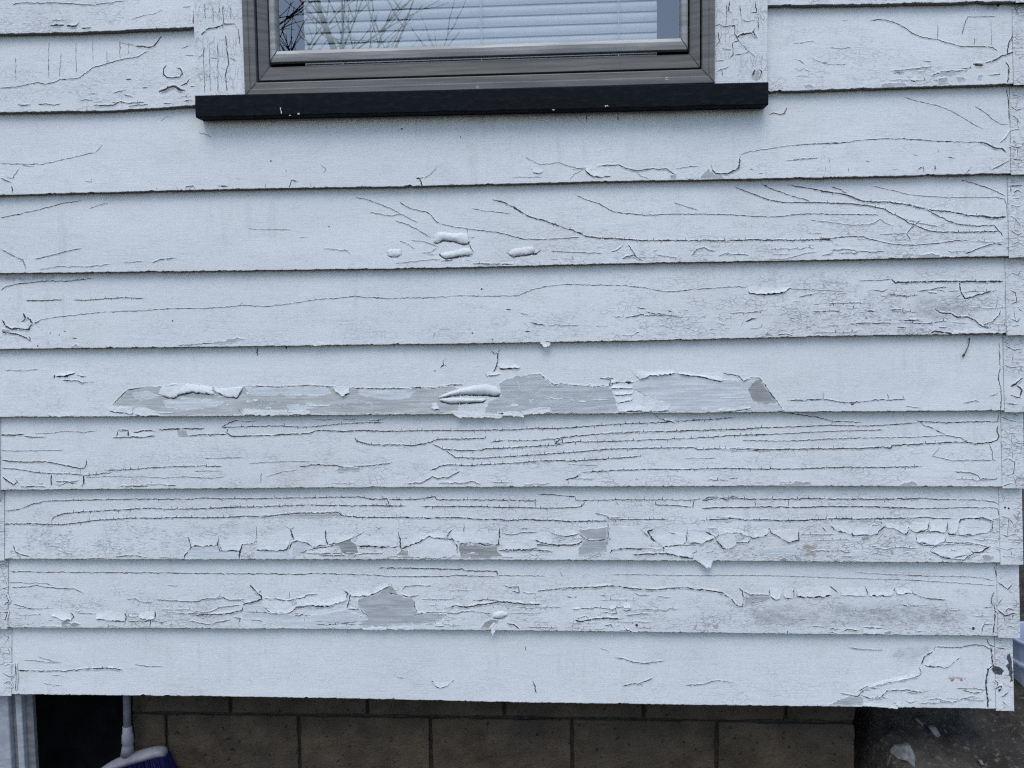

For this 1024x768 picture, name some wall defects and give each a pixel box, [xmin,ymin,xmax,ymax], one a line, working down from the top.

crack [0,0,241,121]
crack [356,1,1024,267]
crack [0,247,748,321]
peeling [106,369,785,440]
crack [1,269,1024,709]
peeling [87,515,1000,568]
peeling [15,582,678,636]
peeling [780,618,892,635]
peeling [718,585,990,618]
peeling [827,643,1013,709]